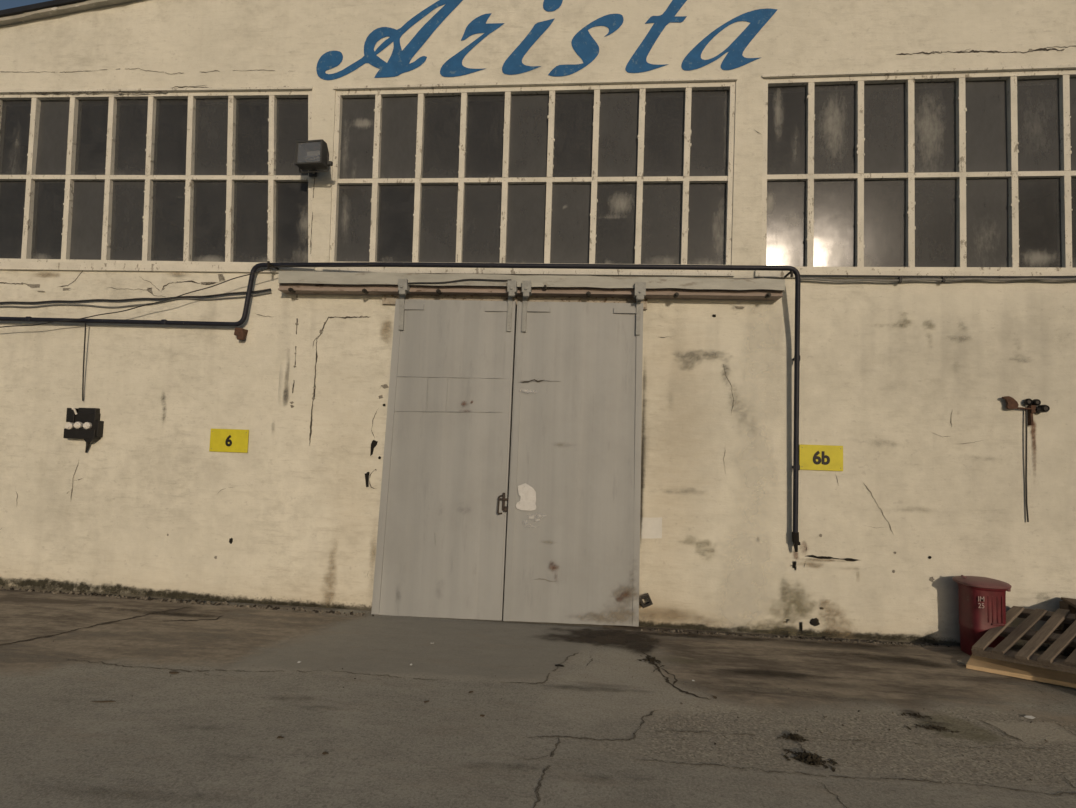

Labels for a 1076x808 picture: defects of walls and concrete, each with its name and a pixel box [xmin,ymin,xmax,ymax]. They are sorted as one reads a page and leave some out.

crack [896,46,1067,55]
crack [255,295,369,444]
crack [1,607,432,680]
crack [503,653,593,684]
crack [642,652,708,699]
leakage [594,588,942,667]
crack [521,710,1076,808]